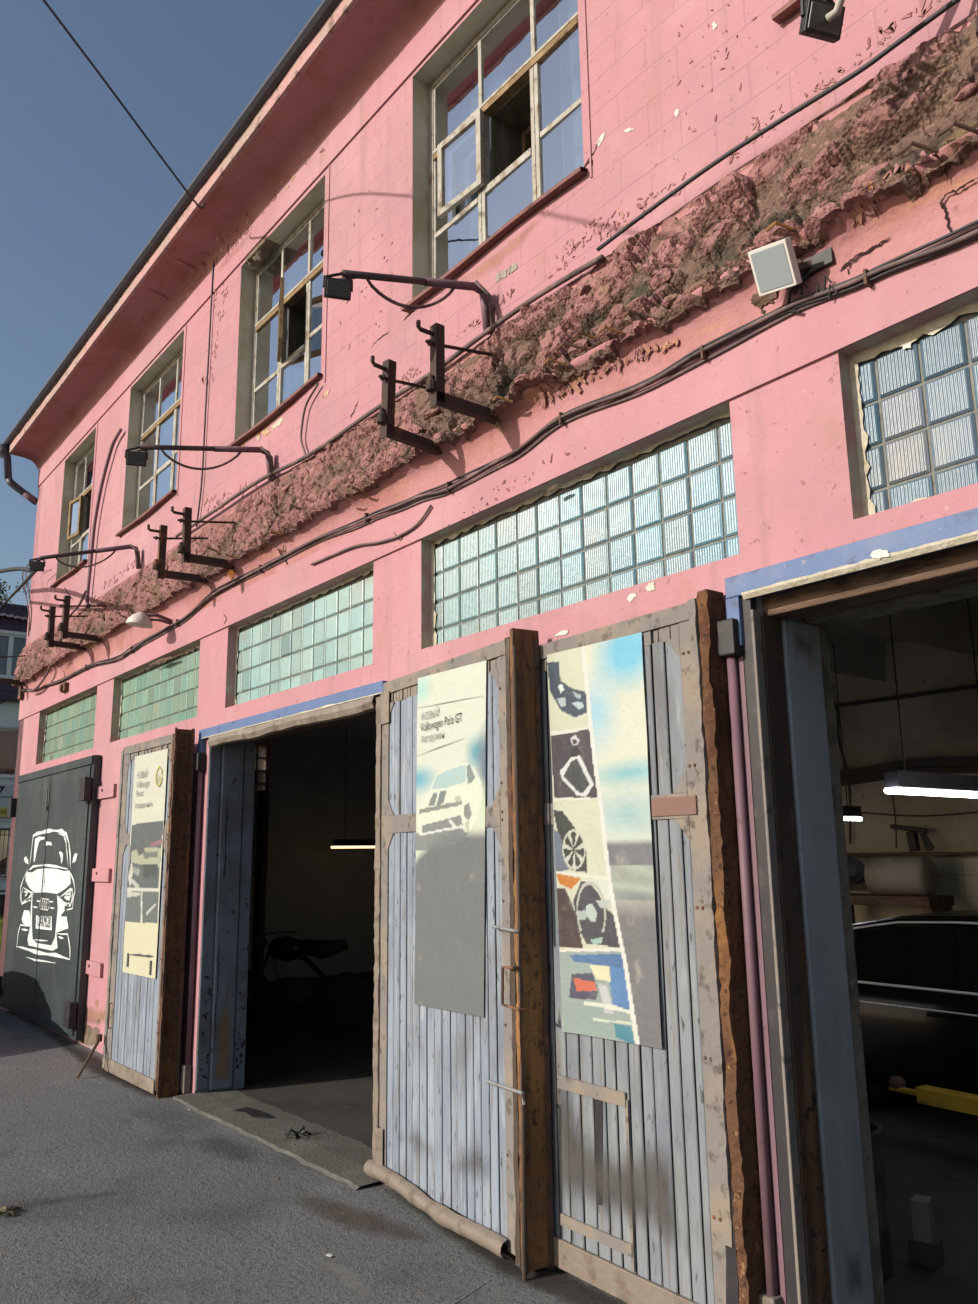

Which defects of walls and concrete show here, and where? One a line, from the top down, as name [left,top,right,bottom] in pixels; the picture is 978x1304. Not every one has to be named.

spalling [12,0,978,687]
crack [931,152,978,232]
rust [156,729,192,1099]
rust [509,628,549,1272]
rust [696,589,767,1304]